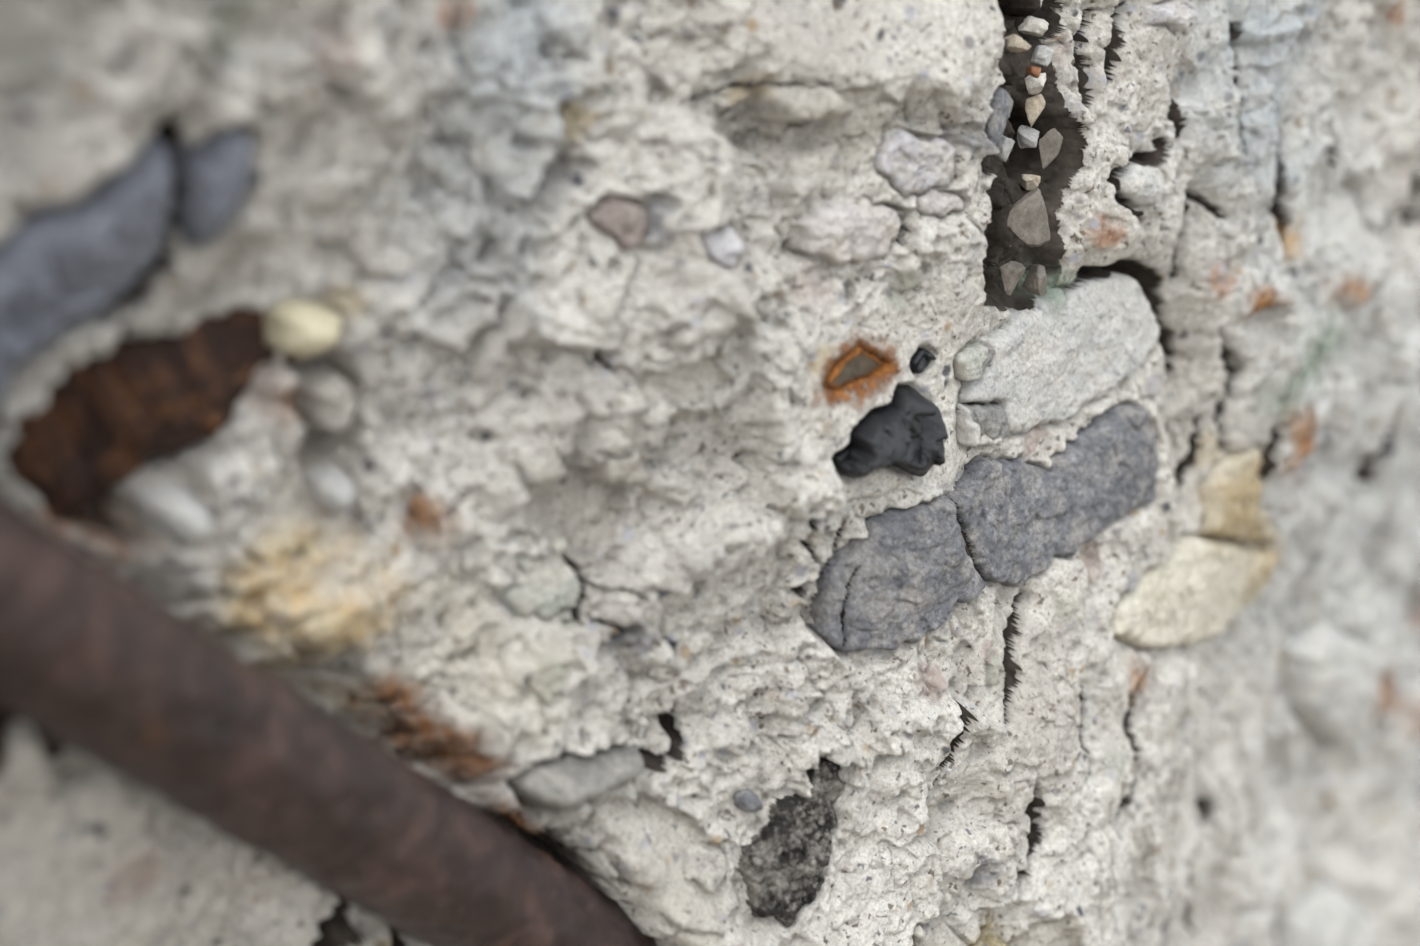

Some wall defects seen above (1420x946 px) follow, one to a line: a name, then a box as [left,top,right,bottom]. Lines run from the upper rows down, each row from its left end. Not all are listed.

crack [885,204,910,246]
crack [981,0,1226,382]
crack [1228,23,1341,277]
spalling [13,407,236,557]
corrosion [815,338,901,407]
crack [1174,334,1284,530]
corrosion [0,306,657,946]
crack [309,895,407,946]